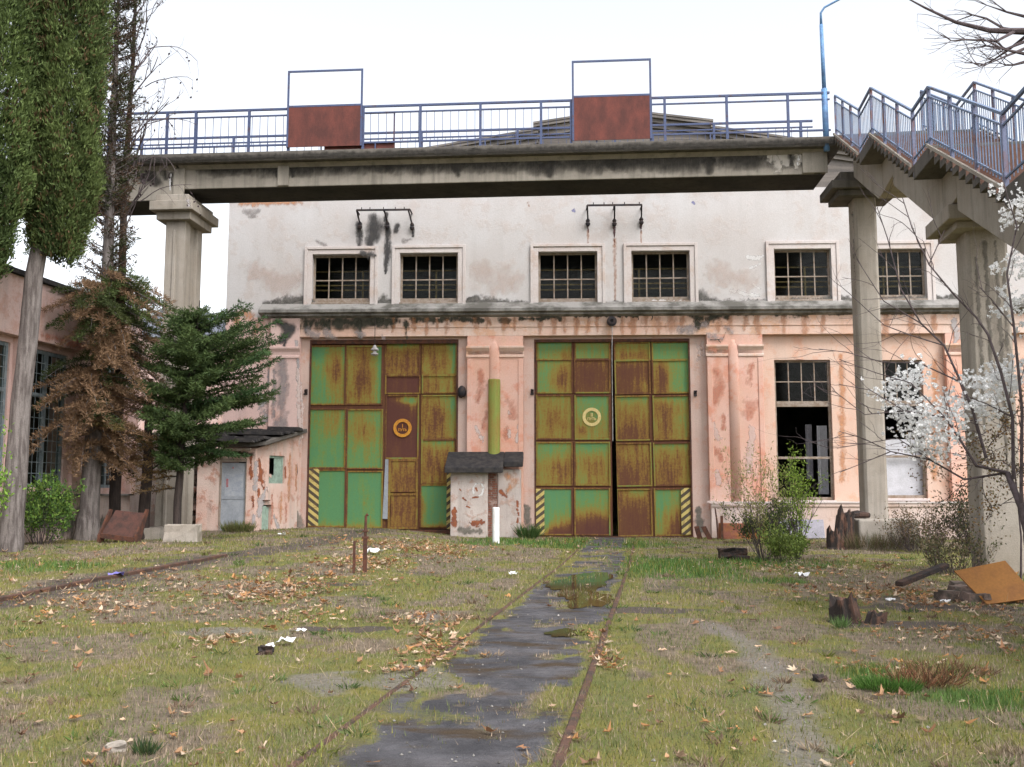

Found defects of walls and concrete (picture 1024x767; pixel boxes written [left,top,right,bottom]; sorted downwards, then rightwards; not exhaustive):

damp [129,139,835,190]
damp [356,212,400,274]
damp [498,316,639,324]
flaking render [249,456,287,529]
flaking render [450,487,485,527]